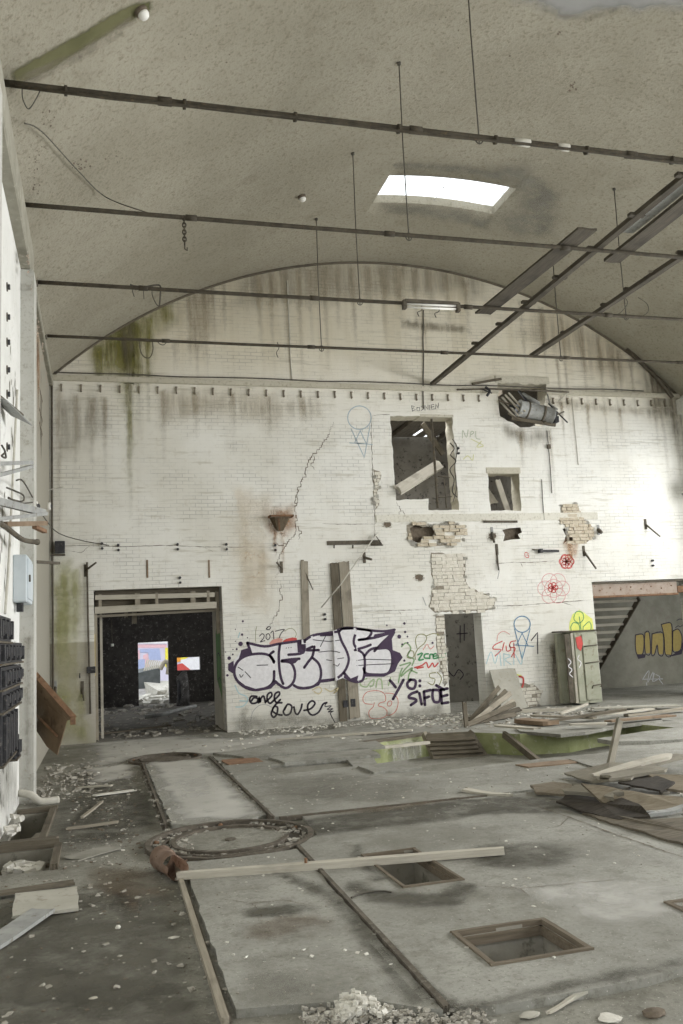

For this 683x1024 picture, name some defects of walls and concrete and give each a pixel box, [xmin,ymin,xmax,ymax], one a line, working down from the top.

peeling [371,469,382,510]
crack [251,414,412,624]
spalling [558,502,597,545]
crack [72,545,220,553]
peeling [405,521,497,686]